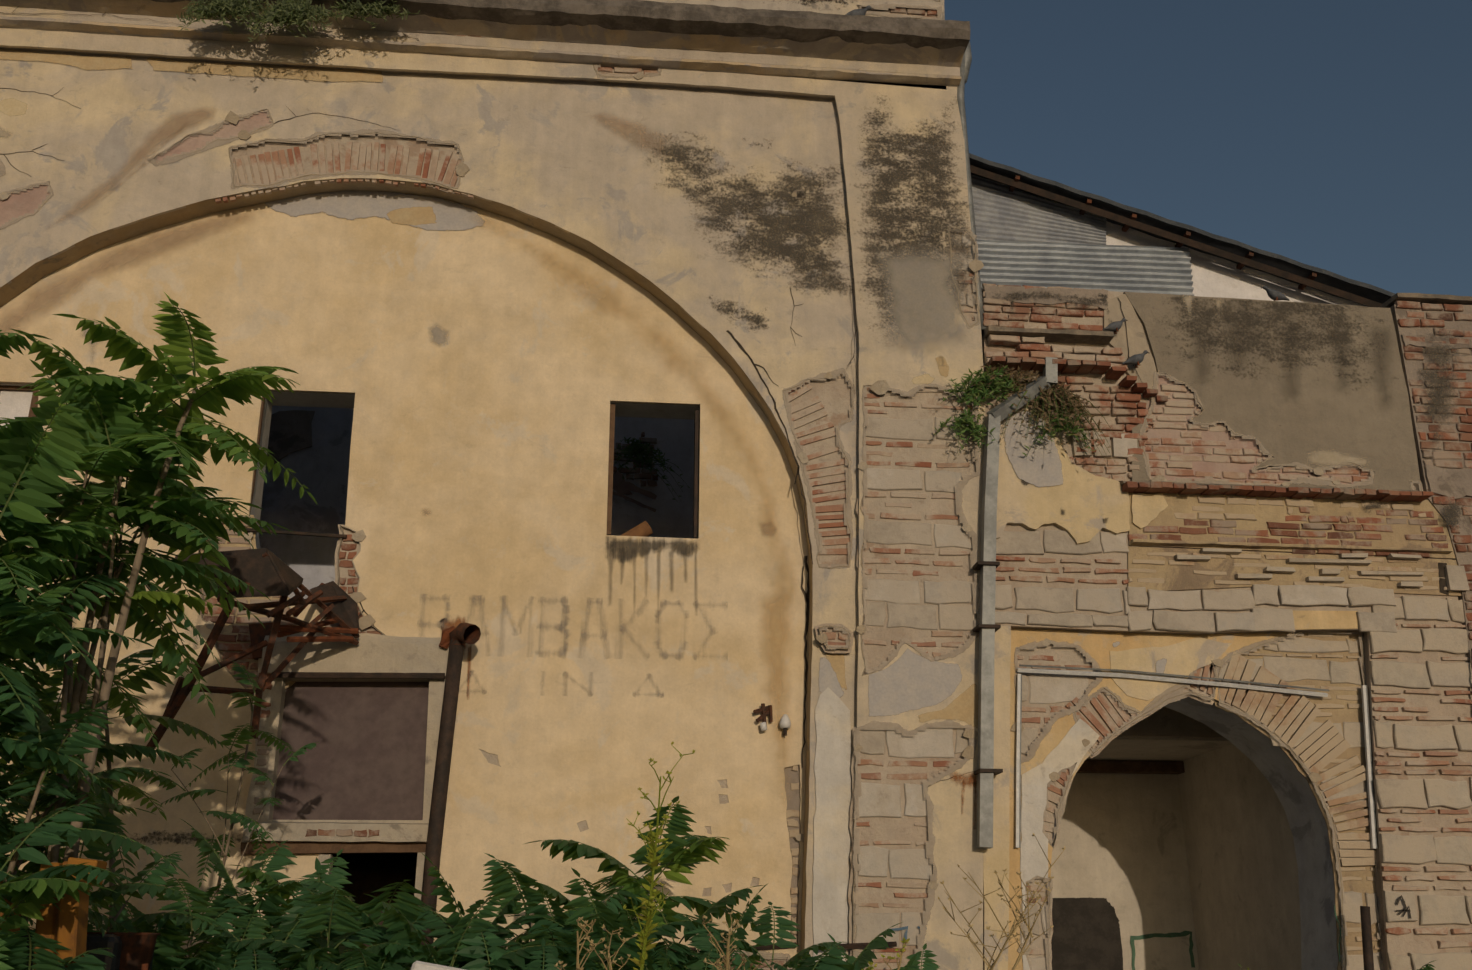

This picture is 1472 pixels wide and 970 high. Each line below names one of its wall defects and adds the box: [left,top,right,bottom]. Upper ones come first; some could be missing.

peeling [0,49,383,82]
spalling [147,109,485,231]
damp [608,100,973,342]
damp [1172,296,1368,383]
peeling [1005,410,1063,487]
spalling [1138,372,1375,488]
spalling [198,515,257,553]
spalling [320,524,384,635]
damp [607,539,697,562]
spalling [199,588,299,718]
spalling [782,356,981,970]
spalling [1010,631,1384,970]